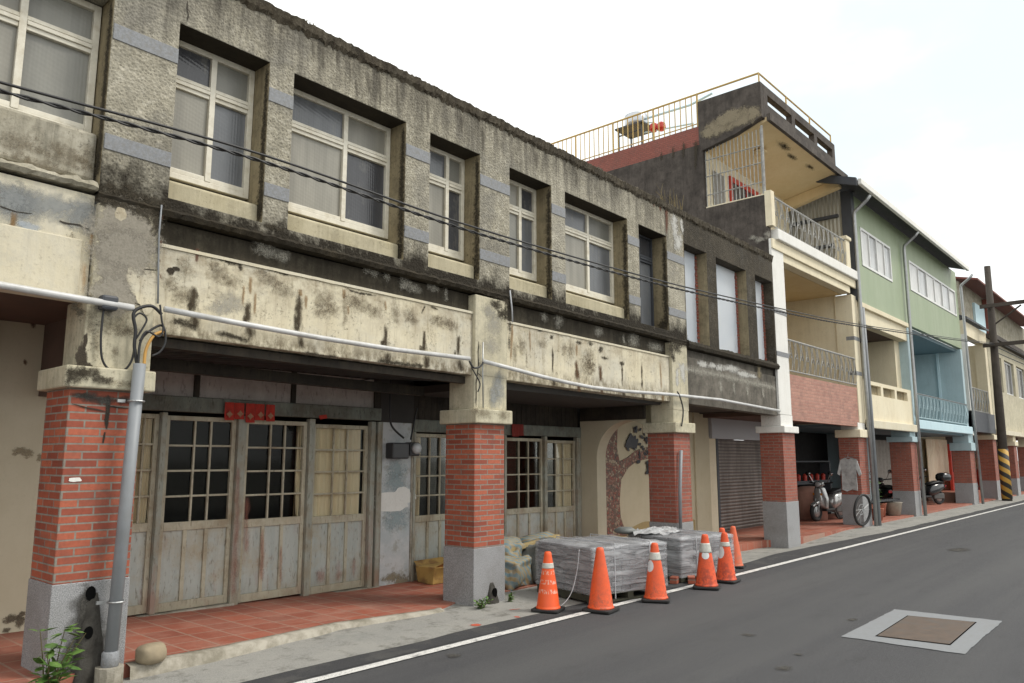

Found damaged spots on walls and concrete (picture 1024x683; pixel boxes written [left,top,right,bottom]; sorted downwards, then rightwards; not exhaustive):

leakage [65,366,131,405]
leakage [167,280,199,330]
leakage [217,303,255,342]
leakage [260,270,338,358]
leakage [378,327,430,368]
leakage [569,341,607,394]
leakage [668,334,775,396]
peeling [374,487,416,512]